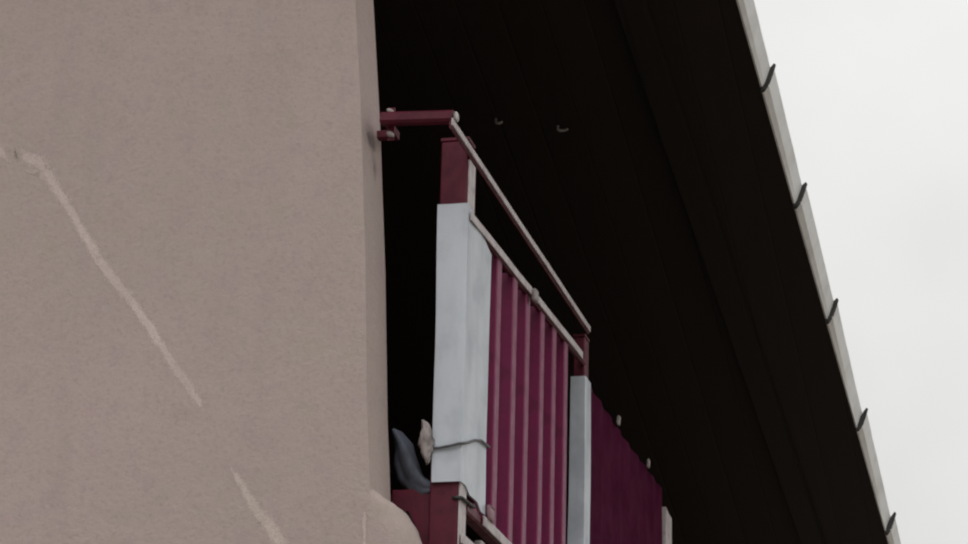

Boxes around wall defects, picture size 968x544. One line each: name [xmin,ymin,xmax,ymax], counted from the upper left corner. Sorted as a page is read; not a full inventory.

crack [0,145,203,407]
crack [229,465,290,544]